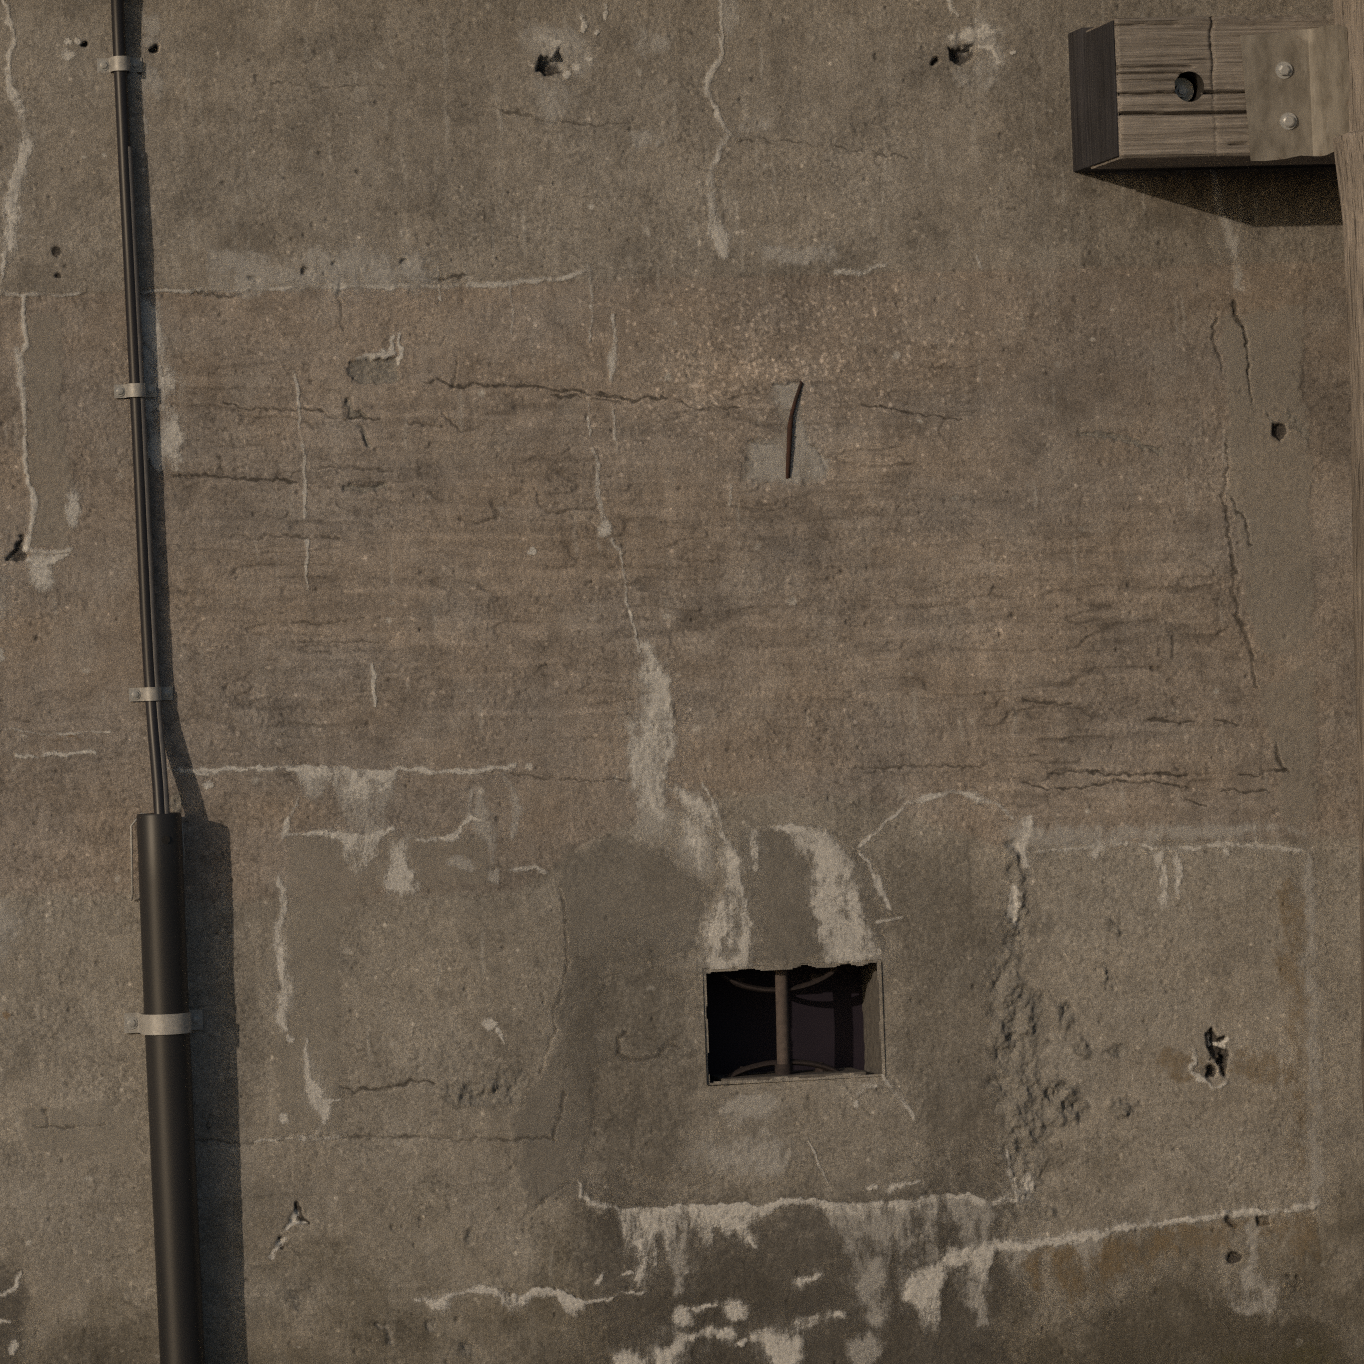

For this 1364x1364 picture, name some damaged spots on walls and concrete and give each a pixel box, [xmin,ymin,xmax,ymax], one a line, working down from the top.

spalling [537,37,593,79]
peeling [580,4,608,35]
crack [430,361,739,410]
crack [861,404,962,421]
crack [1212,302,1253,399]
crack [1224,440,1256,687]
leakage [587,405,758,969]
leakage [167,762,547,897]
leakage [414,815,1325,1364]
spalling [984,841,1091,1221]
spalling [1189,1028,1229,1090]
leakage [0,1271,22,1296]